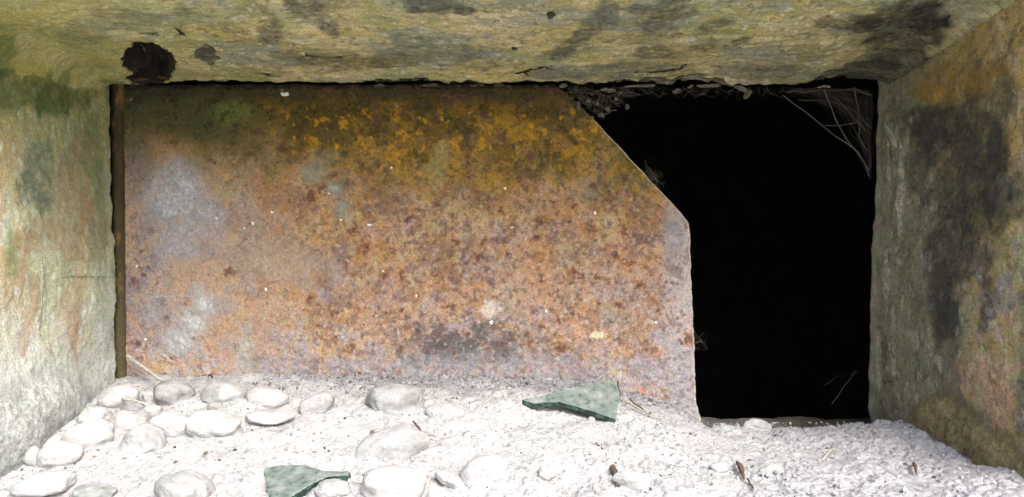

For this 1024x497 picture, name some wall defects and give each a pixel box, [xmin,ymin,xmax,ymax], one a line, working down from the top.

spalling [121,42,177,86]
water stain [817,0,948,82]
water stain [911,102,1020,338]